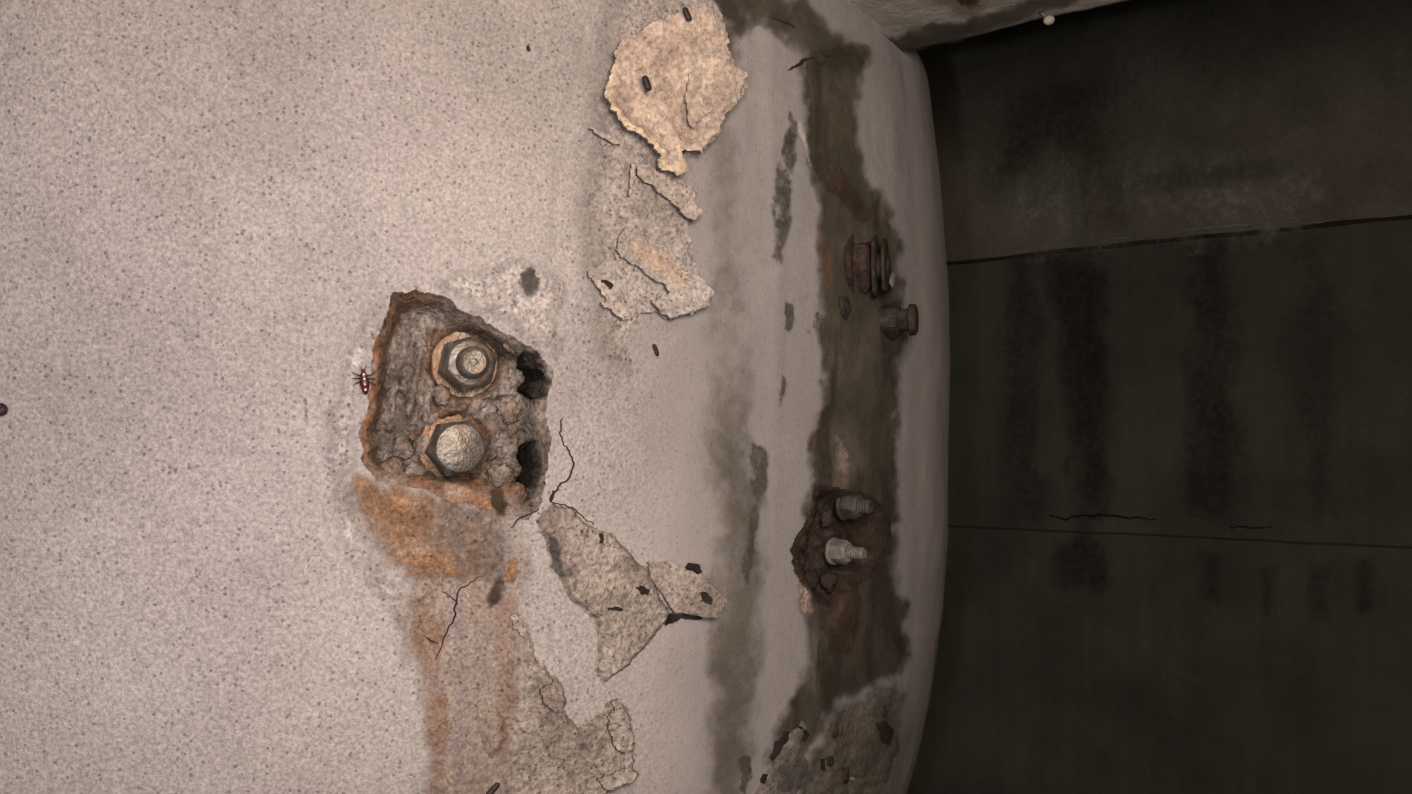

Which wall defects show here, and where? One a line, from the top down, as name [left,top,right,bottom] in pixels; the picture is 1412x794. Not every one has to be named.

peeling [585,0,749,367]
leakage [889,0,1076,52]
spalling [328,261,727,683]
crack [510,418,594,528]
leakage [711,0,909,794]
rust [355,478,529,794]
peeling [428,596,639,794]
spalling [754,686,904,794]